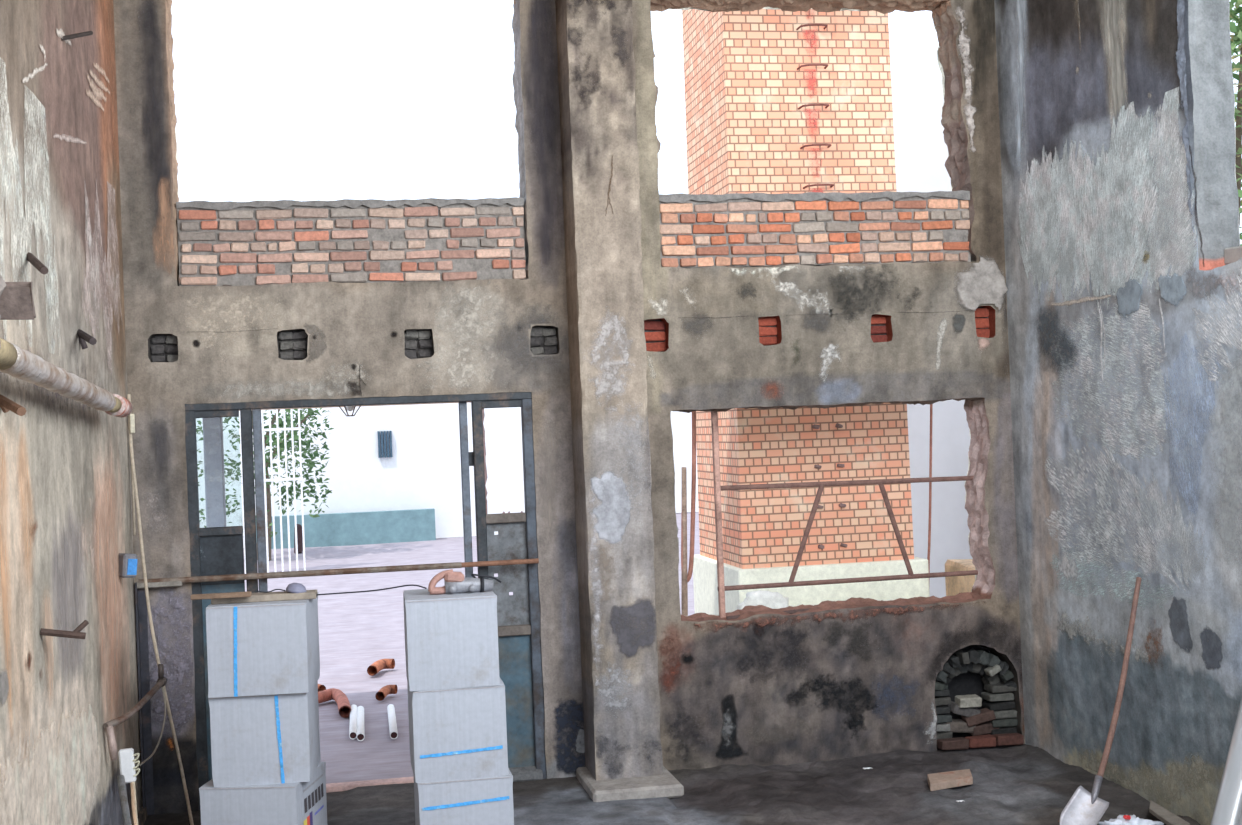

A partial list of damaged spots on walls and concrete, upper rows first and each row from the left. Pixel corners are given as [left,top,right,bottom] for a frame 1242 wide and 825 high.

flaking render [591,472,630,543]
damp [722,715,733,739]
flaking render [0,705,100,825]